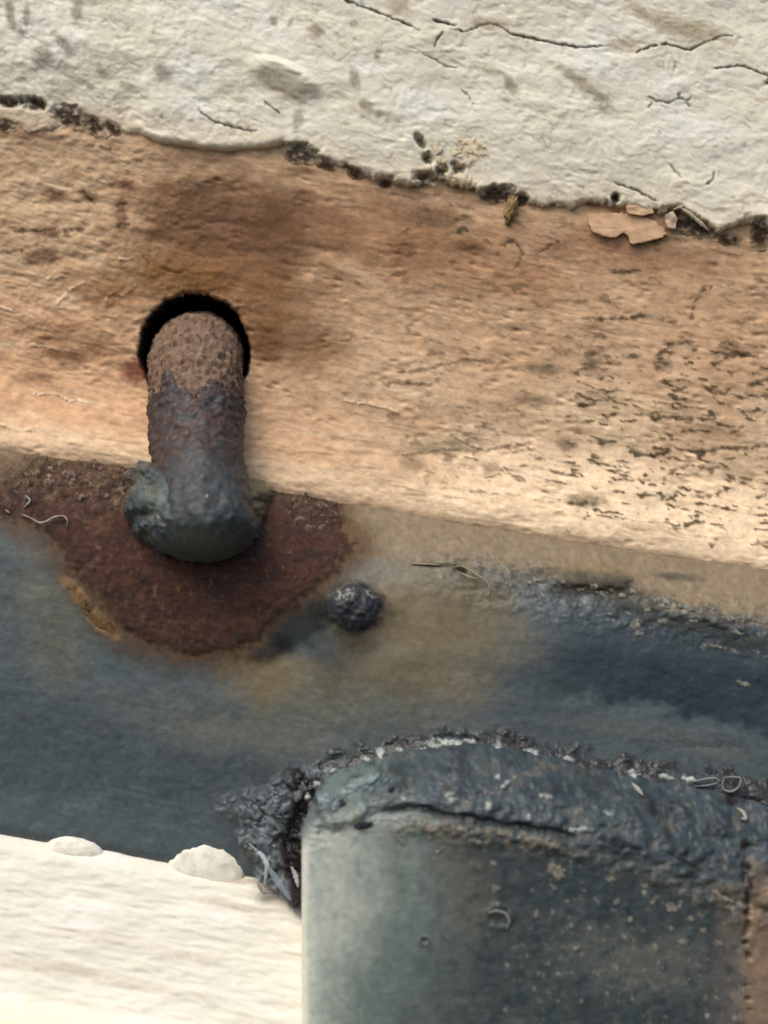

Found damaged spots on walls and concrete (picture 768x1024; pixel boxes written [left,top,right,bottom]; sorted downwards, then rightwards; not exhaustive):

crack [345,0,602,68]
crack [636,35,732,53]
crack [715,65,768,84]
spalling [0,98,45,110]
spalling [57,108,120,134]
flaking render [412,136,528,205]
peeling [587,194,711,245]
rust [146,185,323,364]
rust [125,361,145,381]
rust [0,456,368,662]
peeling [361,747,403,762]
peeling [249,843,299,901]